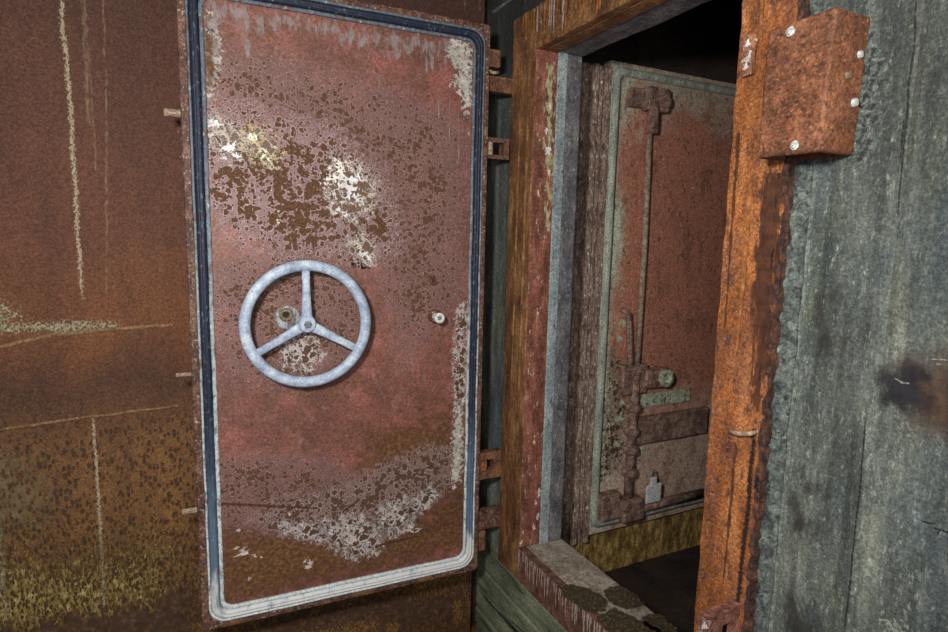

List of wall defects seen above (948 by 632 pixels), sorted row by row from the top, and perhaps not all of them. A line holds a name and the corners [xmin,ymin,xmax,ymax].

peeling [192,10,405,275]
corrosion [200,35,470,395]
peeling [444,38,473,119]
corrosion [724,132,788,411]
corrosion [215,406,468,602]
peeling [236,301,468,563]
corrosion [723,444,737,579]